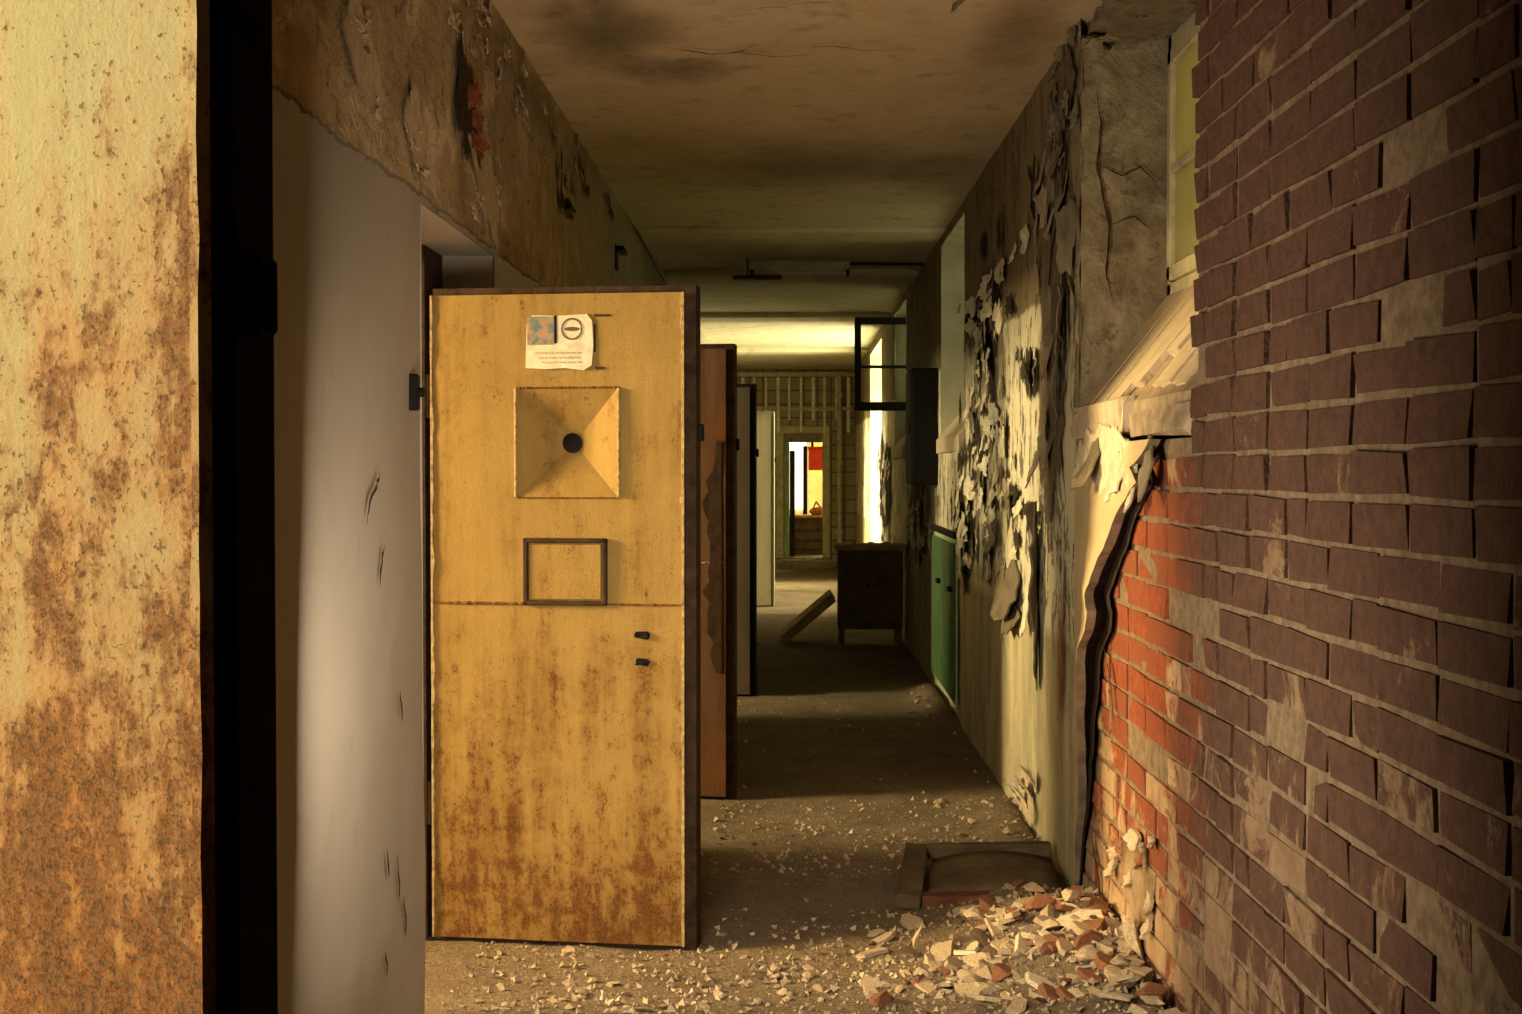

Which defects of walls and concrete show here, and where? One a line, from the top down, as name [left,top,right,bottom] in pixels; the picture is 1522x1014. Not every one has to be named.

spalling [448,0,583,254]
flaking render [950,0,1196,691]
crack [1048,81,1157,397]
peeling [877,431,931,578]
spalling [1103,829,1155,940]